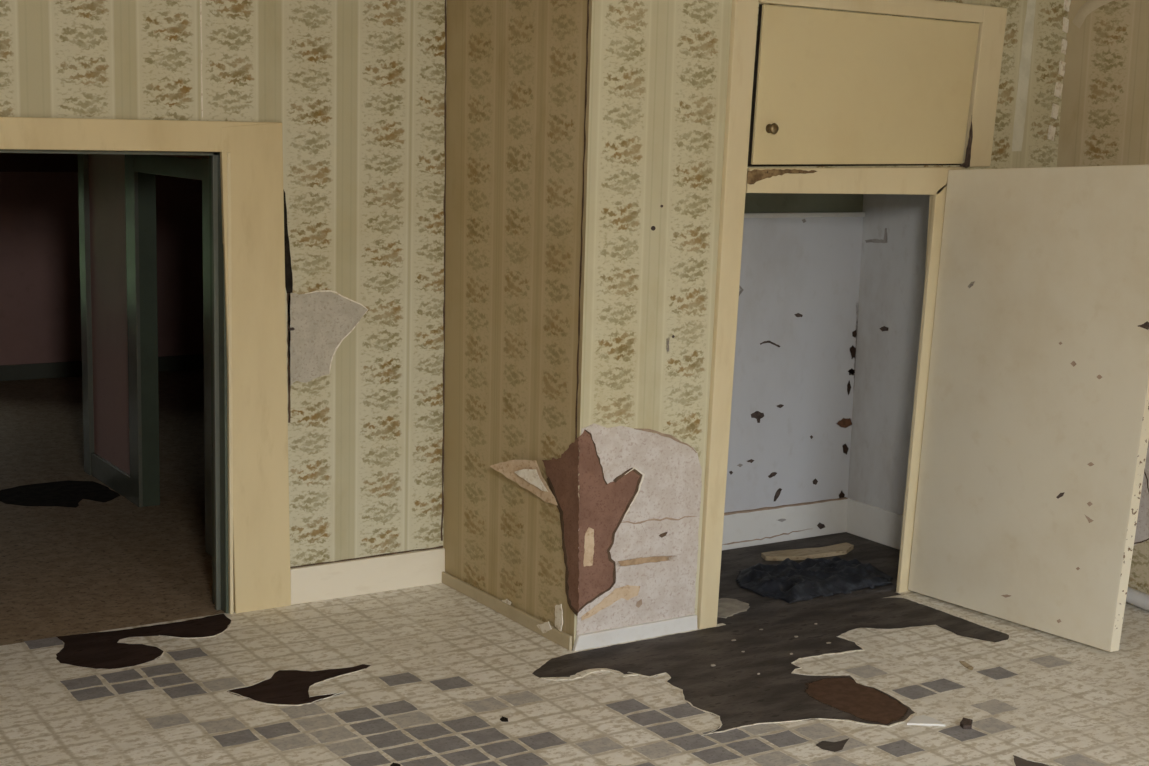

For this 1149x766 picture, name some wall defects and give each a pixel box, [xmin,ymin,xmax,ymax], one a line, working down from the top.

peeling [490,423,702,635]